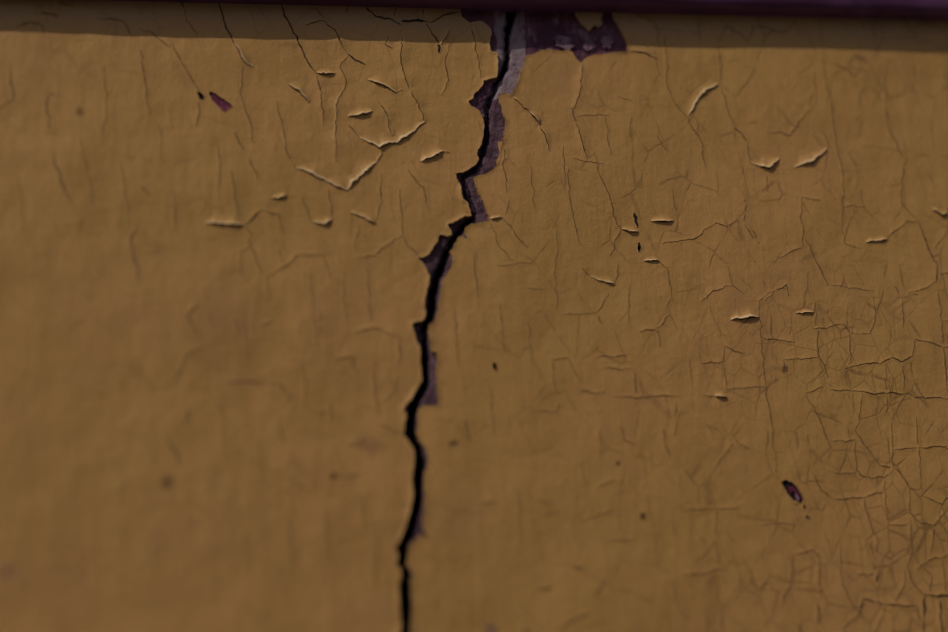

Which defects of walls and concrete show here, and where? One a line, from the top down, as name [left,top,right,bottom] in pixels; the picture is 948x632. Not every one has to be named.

peeling [457,9,497,57]
peeling [524,12,632,64]
peeling [195,89,235,114]
crack [215,3,263,179]
crack [278,5,459,162]
crack [390,11,948,632]
peeling [780,477,812,522]